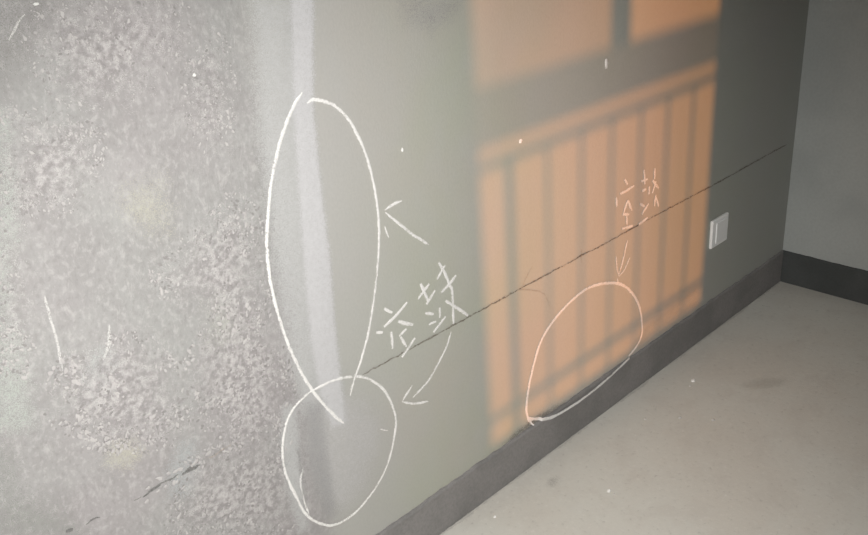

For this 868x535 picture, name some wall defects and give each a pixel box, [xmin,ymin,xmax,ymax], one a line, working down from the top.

crack [363,146,783,375]